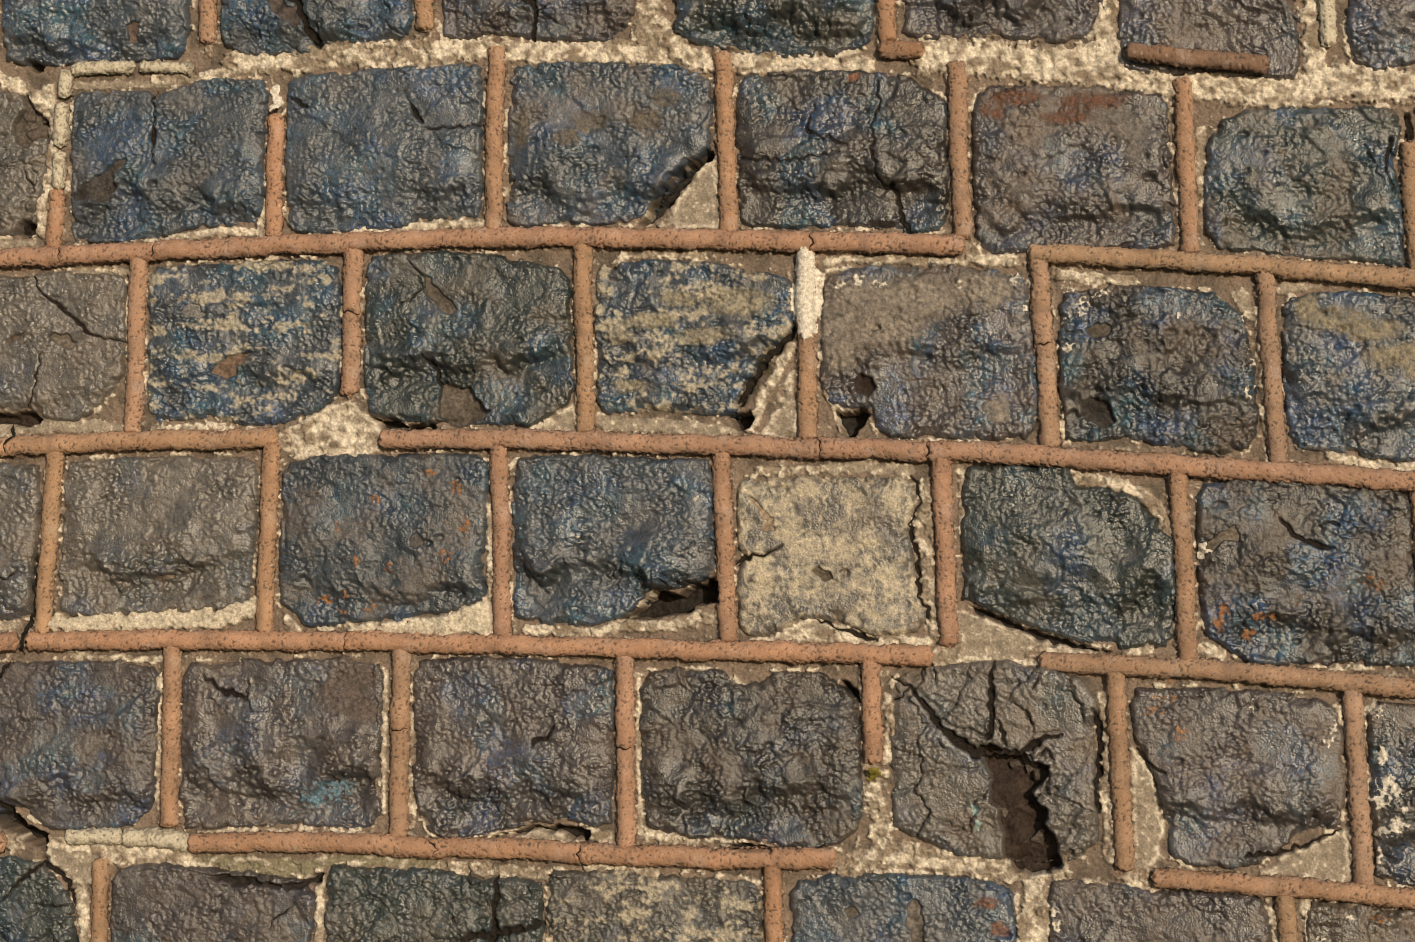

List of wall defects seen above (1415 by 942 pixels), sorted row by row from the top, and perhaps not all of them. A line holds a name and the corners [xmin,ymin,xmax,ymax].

crack [34,244,123,342]
leakage [616,380,643,392]
leakage [607,292,725,345]
leakage [714,290,771,316]
crack [741,330,795,402]
leakage [788,246,1028,372]
crack [0,555,39,678]
crack [892,662,1062,759]
spalling [981,744,1062,872]
crack [1093,710,1164,811]
crack [0,859,76,942]
crack [452,866,542,942]